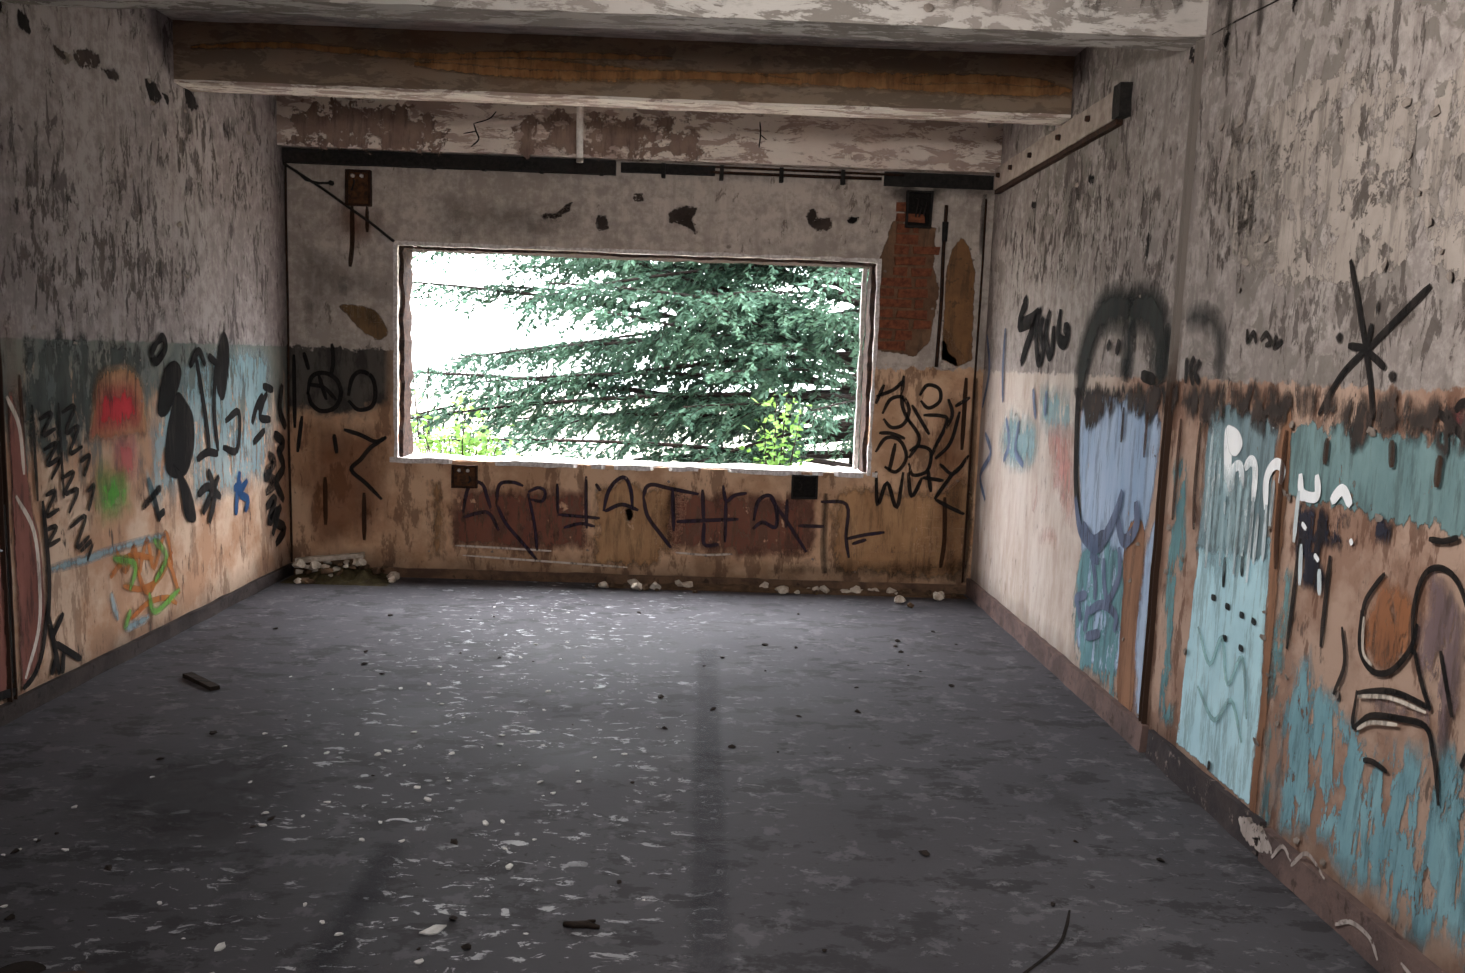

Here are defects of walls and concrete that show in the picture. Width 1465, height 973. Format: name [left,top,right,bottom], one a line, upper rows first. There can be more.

peeling [284,96,451,156]
peeling [508,108,705,163]
flaking render [878,202,976,370]